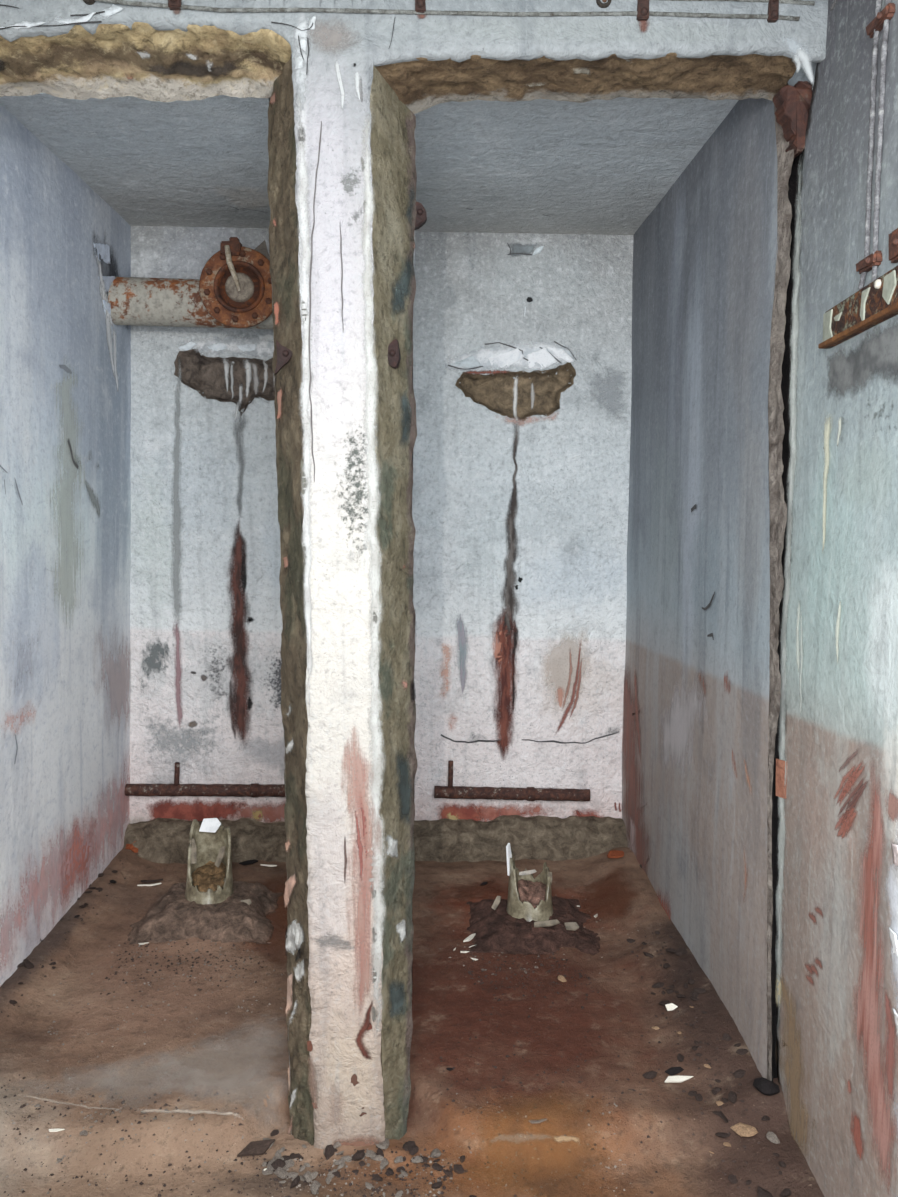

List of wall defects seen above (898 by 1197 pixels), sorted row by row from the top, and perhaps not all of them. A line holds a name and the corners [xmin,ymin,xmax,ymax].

leakage [828,324,898,429]
spalling [0,0,316,1146]
leakage [141,369,213,754]
corrosion [229,417,253,742]
leakage [264,658,282,711]
corrosion [493,427,518,757]
corrosion [557,648,582,731]
spalling [361,53,802,1140]
corrosion [344,737,373,1059]
corrosion [834,750,898,1190]